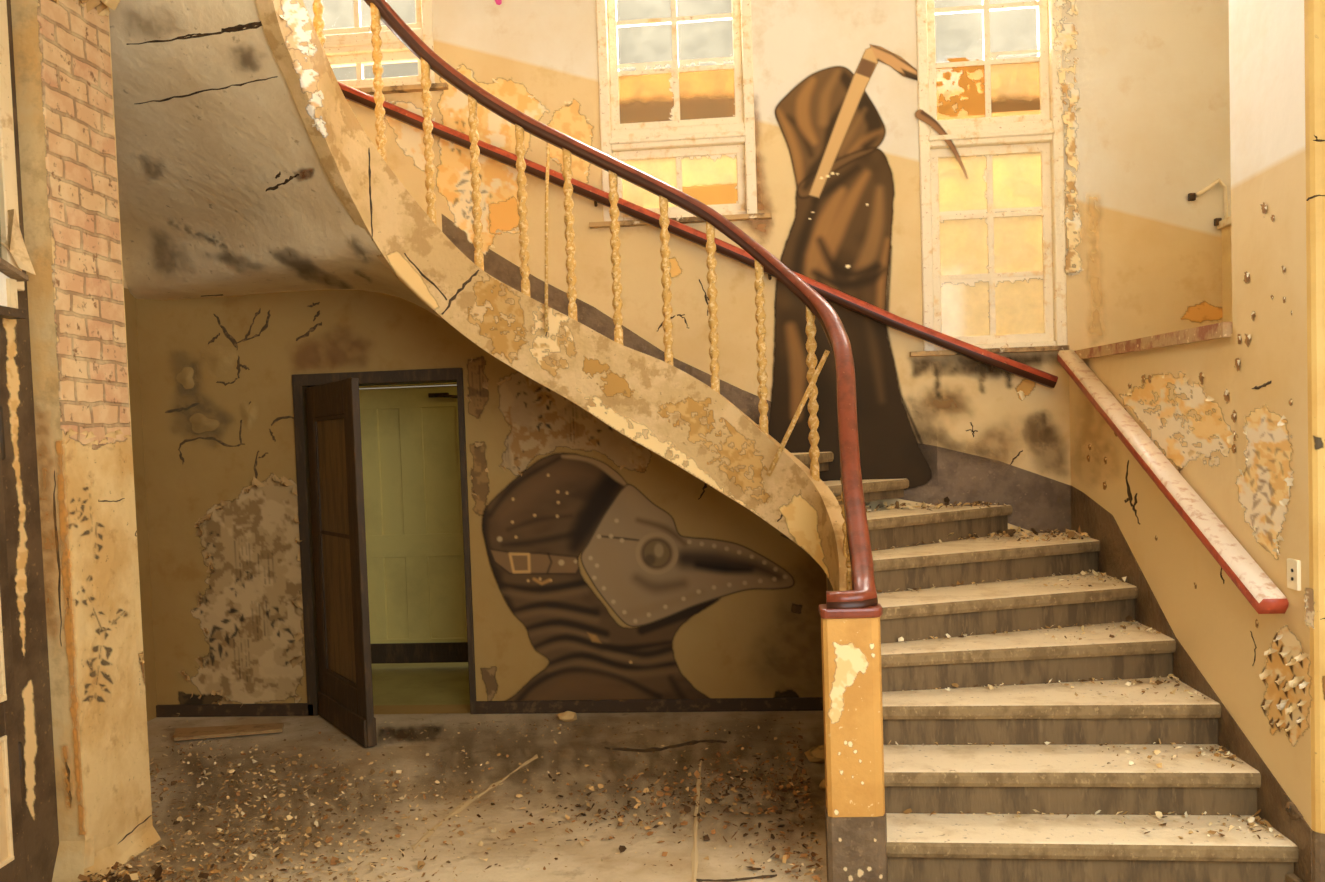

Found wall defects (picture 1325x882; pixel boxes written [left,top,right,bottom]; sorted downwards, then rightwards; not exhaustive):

crack [127,21,262,45]
crack [136,76,277,104]
crack [266,172,299,192]
peeling [386,251,439,311]
peeling [3,318,28,655]
crack [165,294,322,479]
peeling [465,275,829,591]
crack [1124,460,1140,525]
peeling [1120,372,1294,560]
peeling [177,473,305,716]
peeling [22,680,37,819]
peeling [828,642,875,724]